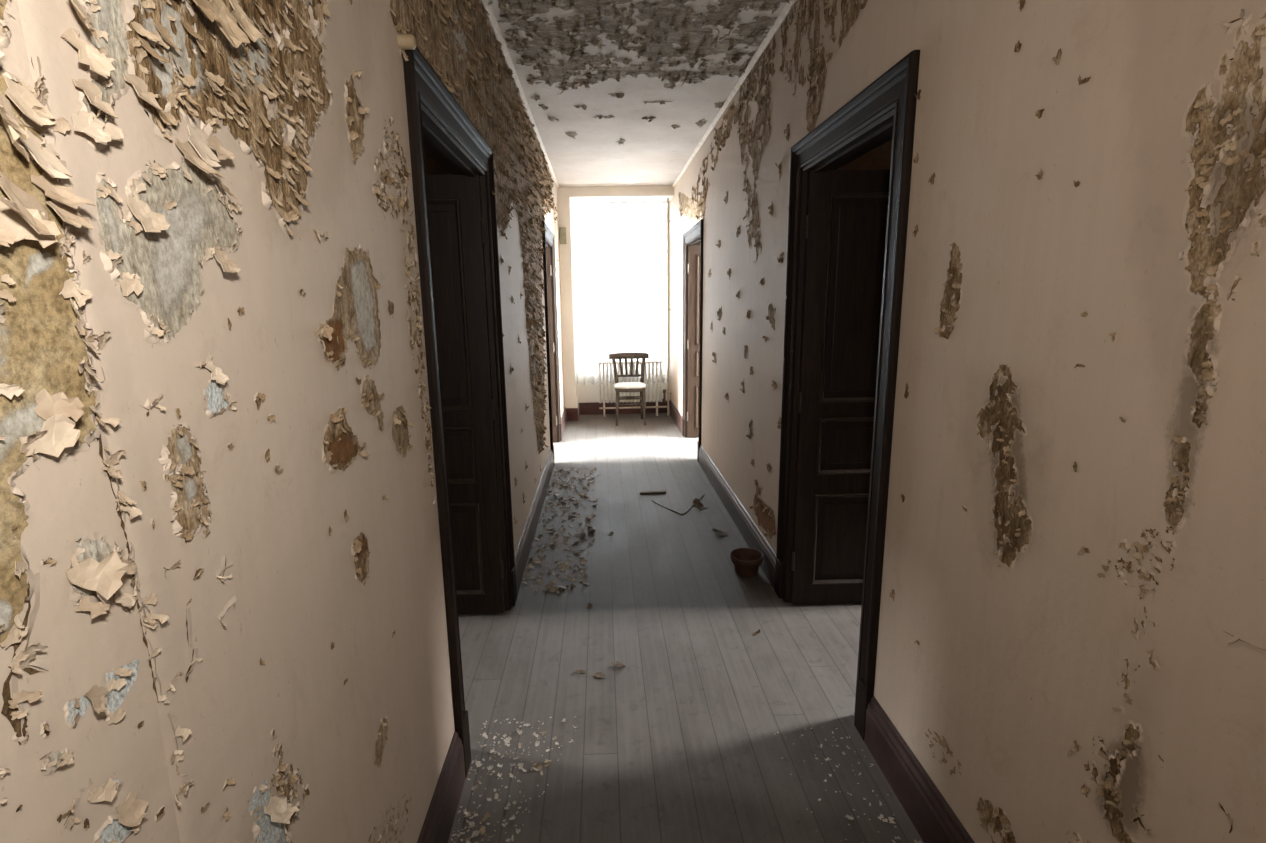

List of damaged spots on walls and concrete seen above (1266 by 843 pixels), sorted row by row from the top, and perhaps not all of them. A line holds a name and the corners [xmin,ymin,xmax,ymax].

peeling [0,0,436,650]
peeling [386,0,869,524]
peeling [976,362,1034,571]
peeling [1067,13,1266,843]
peeling [246,728,310,843]